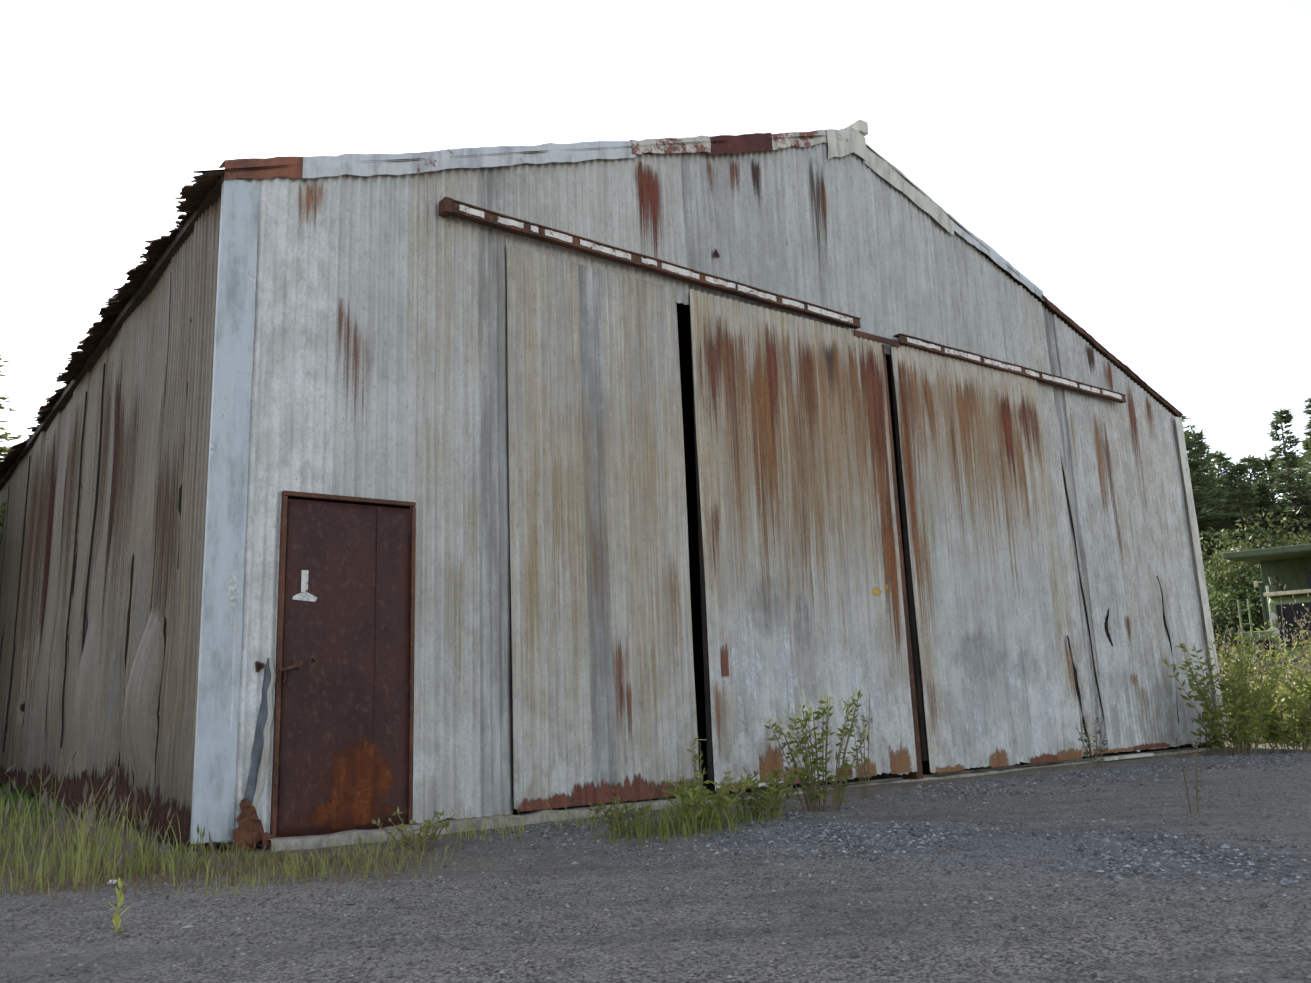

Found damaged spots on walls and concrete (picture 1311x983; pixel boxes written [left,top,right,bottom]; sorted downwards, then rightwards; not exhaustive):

corrosion [635,162,661,253]
corrosion [339,303,367,414]
corrosion [700,324,1044,646]
corrosion [1094,419,1123,557]
corrosion [716,629,762,747]
corrosion [302,741,393,828]
corrosion [518,774,695,812]
corrosion [722,745,805,790]
corrosion [837,745,911,779]
corrosion [936,764,965,773]
corrosion [989,749,1008,768]
corrosion [1030,743,1170,764]